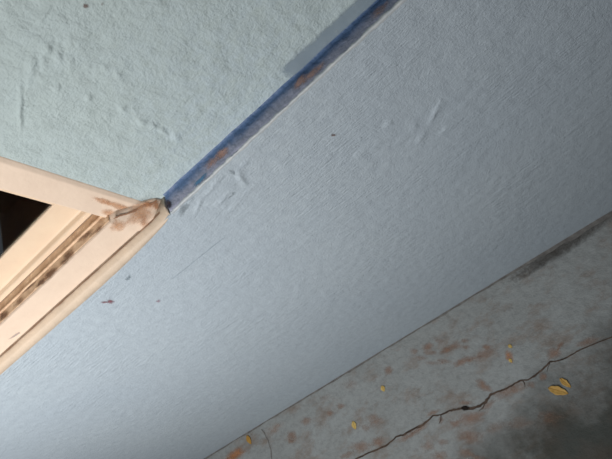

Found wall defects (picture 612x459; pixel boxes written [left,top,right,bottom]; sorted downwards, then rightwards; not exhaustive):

crack [205,212,612,459]